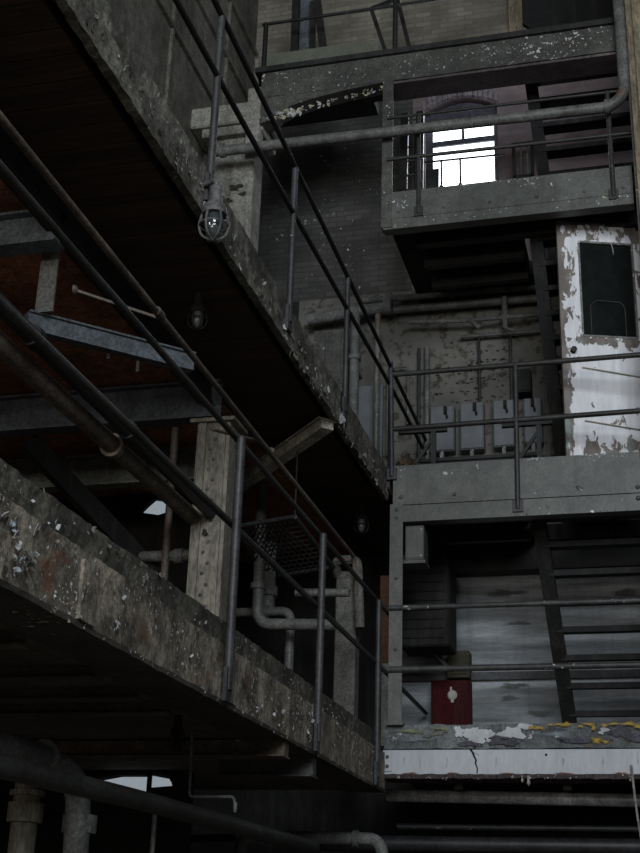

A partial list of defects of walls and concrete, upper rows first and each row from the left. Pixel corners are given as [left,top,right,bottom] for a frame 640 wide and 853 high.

peeling [274,67,383,120]
spalling [454,723,640,747]
crack [469,745,478,774]